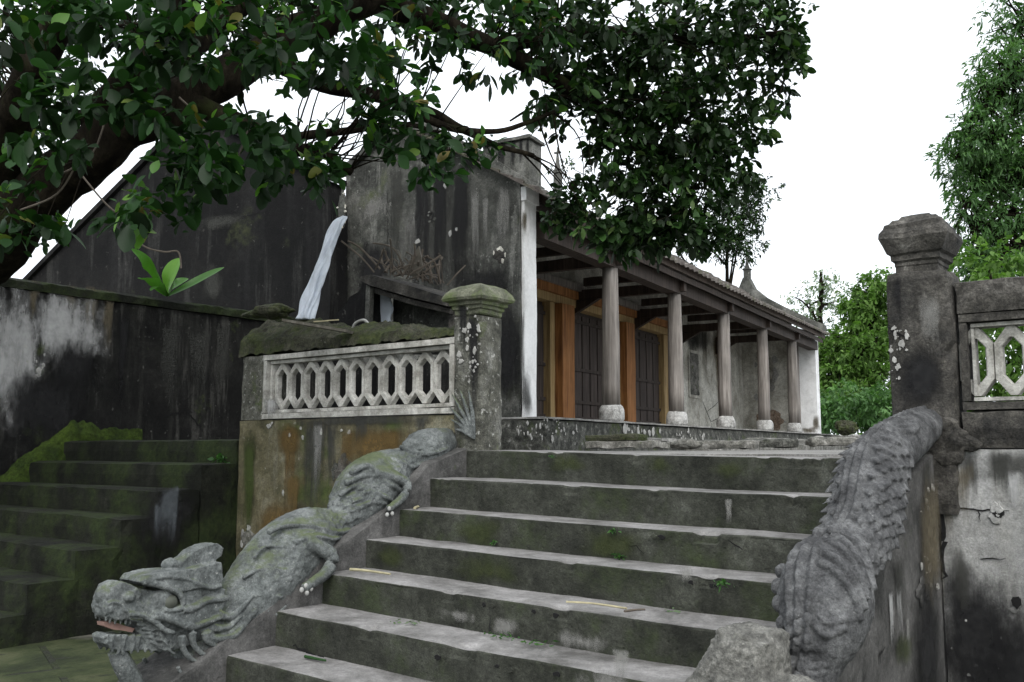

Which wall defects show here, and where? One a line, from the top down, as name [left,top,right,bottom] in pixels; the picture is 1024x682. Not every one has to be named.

water stain [358,166,508,290]
spalling [493,246,506,264]
water stain [10,339,96,440]
flaking render [456,307,481,377]
water stain [501,312,531,410]
flaking render [888,325,910,380]
water stain [245,447,253,525]
water stain [304,415,399,496]
flaking render [516,418,578,443]
flaking render [623,423,661,436]
water stain [889,559,904,623]
water stain [907,556,1024,682]